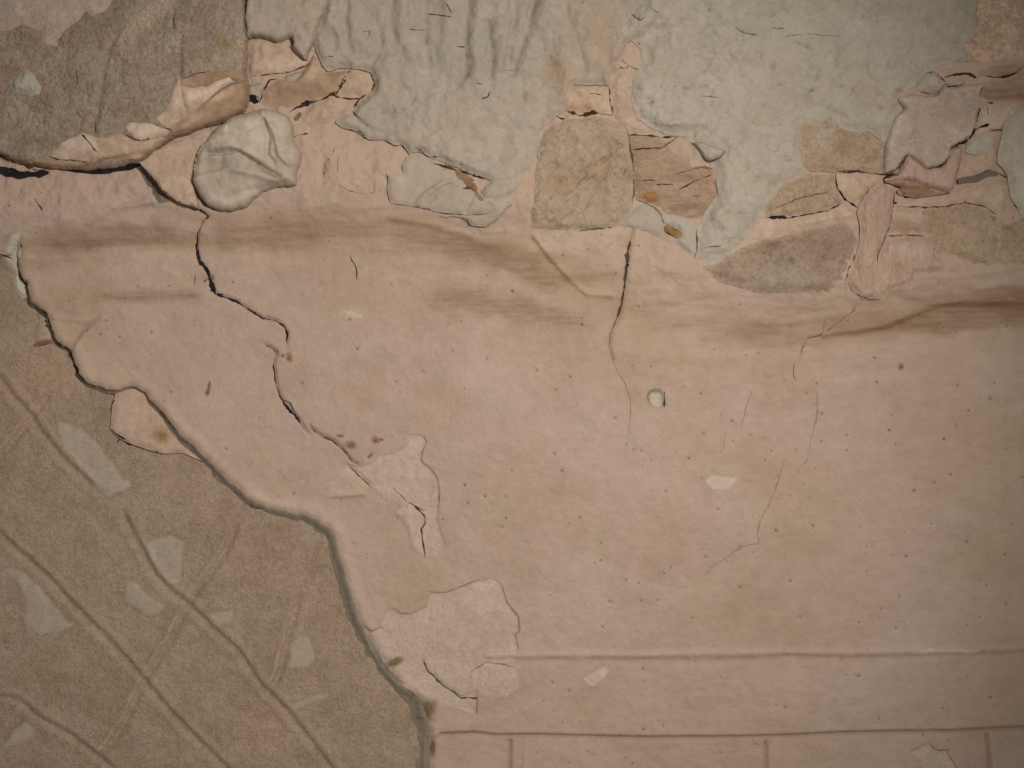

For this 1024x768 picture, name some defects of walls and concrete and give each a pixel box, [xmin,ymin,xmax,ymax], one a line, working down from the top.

spalling [140,167,169,203]
spalling [455,171,483,201]
spalling [693,142,725,162]
crack [163,190,370,486]
crack [581,227,631,428]
spalling [0,259,520,768]
crack [710,403,818,569]